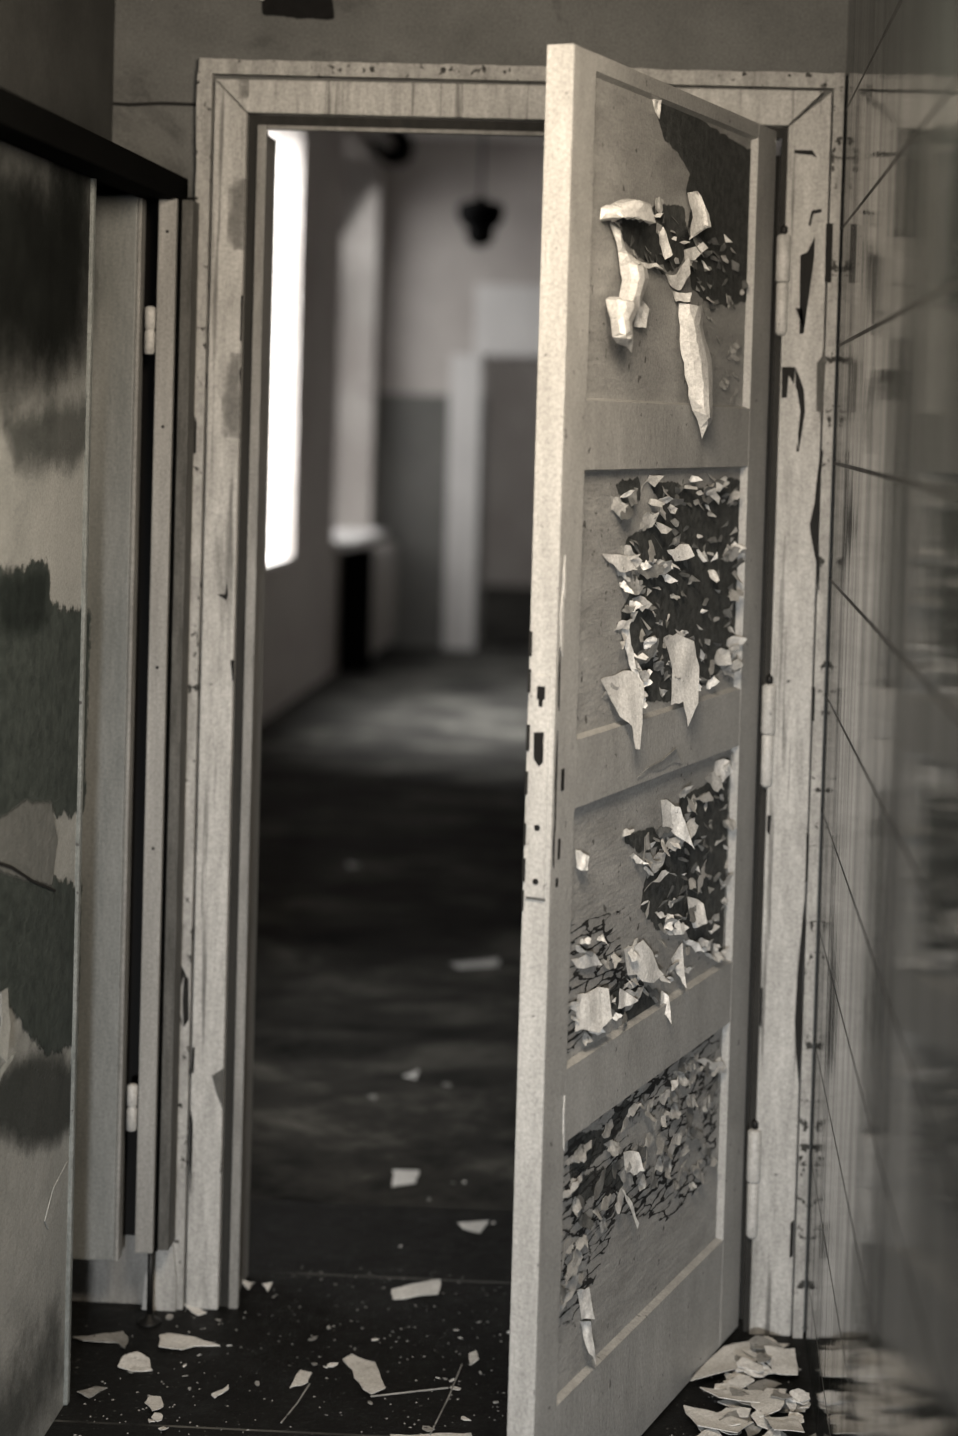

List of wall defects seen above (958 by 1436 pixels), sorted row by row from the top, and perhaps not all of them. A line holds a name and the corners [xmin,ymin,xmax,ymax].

peeling [600,99,751,438]
peeling [0,559,91,1063]